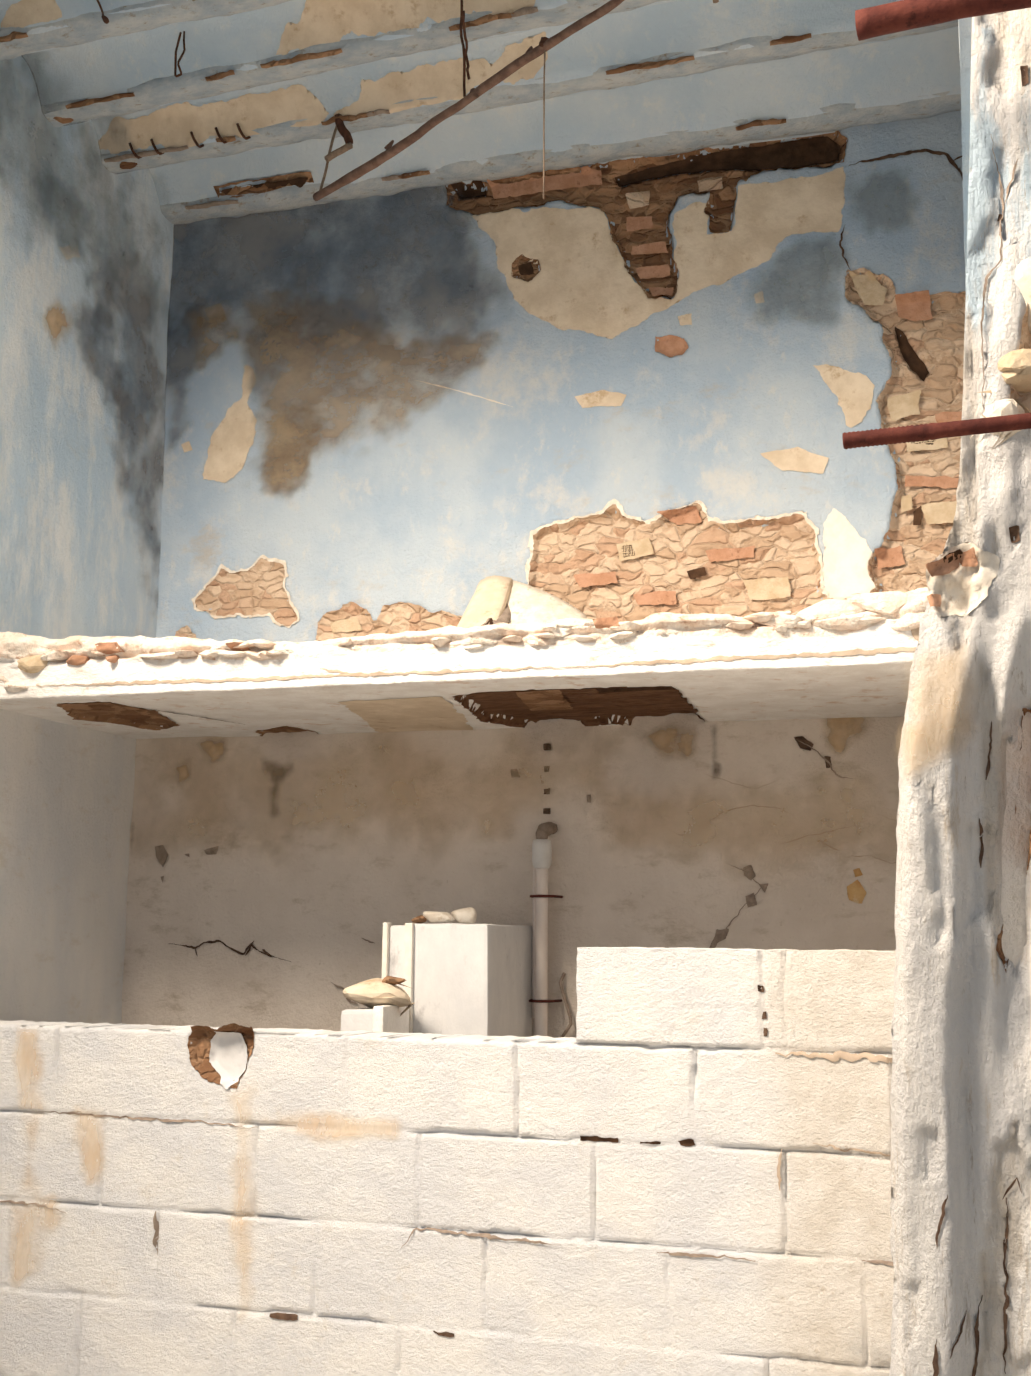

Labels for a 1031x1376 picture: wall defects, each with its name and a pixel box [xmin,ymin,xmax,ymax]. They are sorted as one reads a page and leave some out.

peeling [276,0,535,55]
flaking render [1020,65,1029,87]
peeling [445,130,848,357]
leakage [6,55,485,553]
flaking render [525,137,1018,629]
flaking render [1009,525,1020,543]
flaking render [225,642,250,651]
flaking render [191,555,300,628]
flaking render [316,602,462,641]
crack [175,940,291,962]
spalling [187,1023,254,1089]
crack [932,1177,1022,1376]